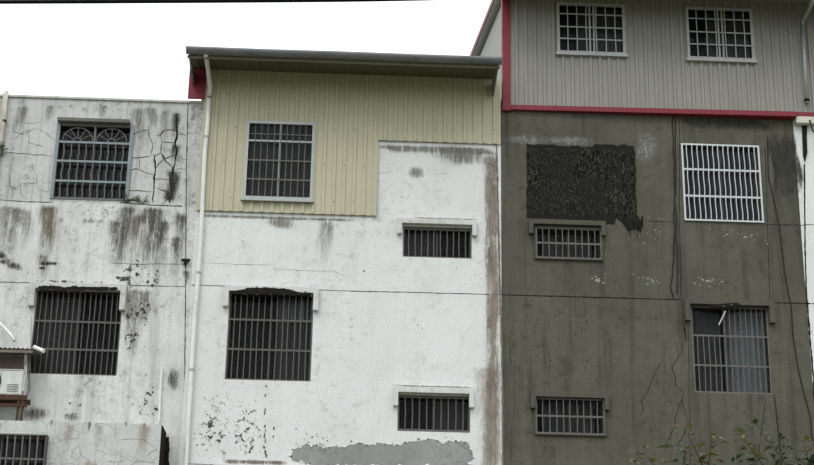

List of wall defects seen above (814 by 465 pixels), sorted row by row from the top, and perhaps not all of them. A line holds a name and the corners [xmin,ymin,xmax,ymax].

water stain [2,207,55,246]
water stain [111,207,186,258]
water stain [164,171,179,200]
crack [120,108,312,395]
crack [651,118,680,227]
water stain [115,260,158,349]
water stain [383,145,499,463]
crack [320,145,690,465]
crack [61,427,158,465]
peeling [288,433,475,465]